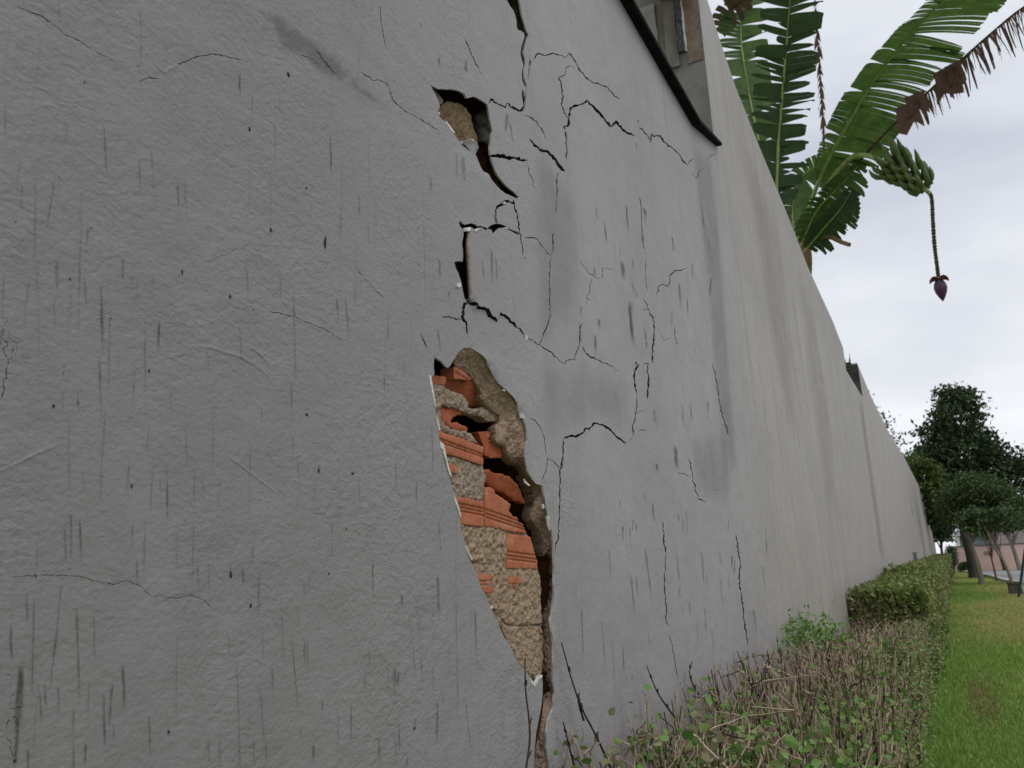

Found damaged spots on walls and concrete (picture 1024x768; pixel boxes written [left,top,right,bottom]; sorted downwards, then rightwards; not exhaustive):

crack [19,7,116,63]
flaking render [432,88,516,299]
crack [441,0,714,549]
crack [712,363,728,434]
crack [19,574,212,608]
flaking render [429,347,553,768]
crack [662,521,678,678]
crack [735,533,749,658]